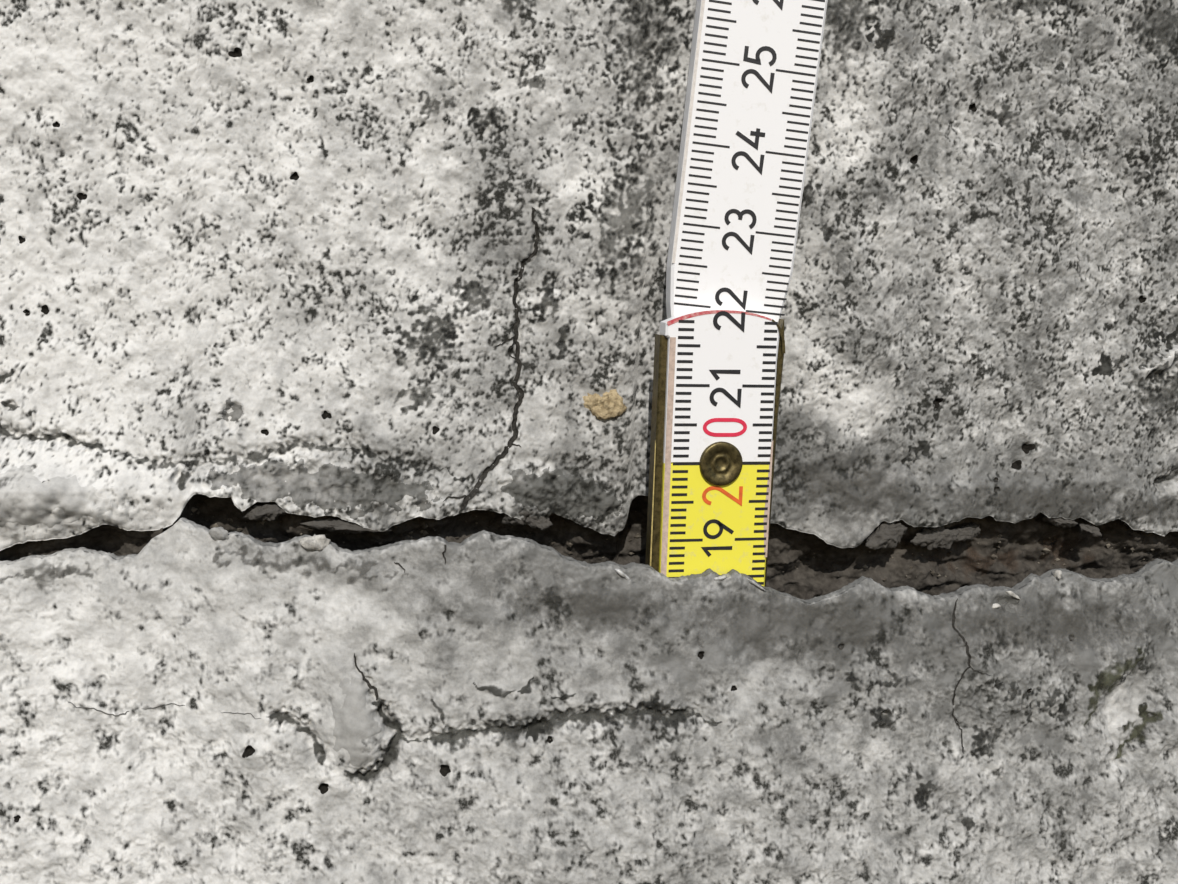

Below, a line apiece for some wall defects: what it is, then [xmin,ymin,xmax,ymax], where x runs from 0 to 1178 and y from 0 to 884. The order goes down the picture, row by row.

crack [0,207,648,573]
crack [766,512,1178,753]